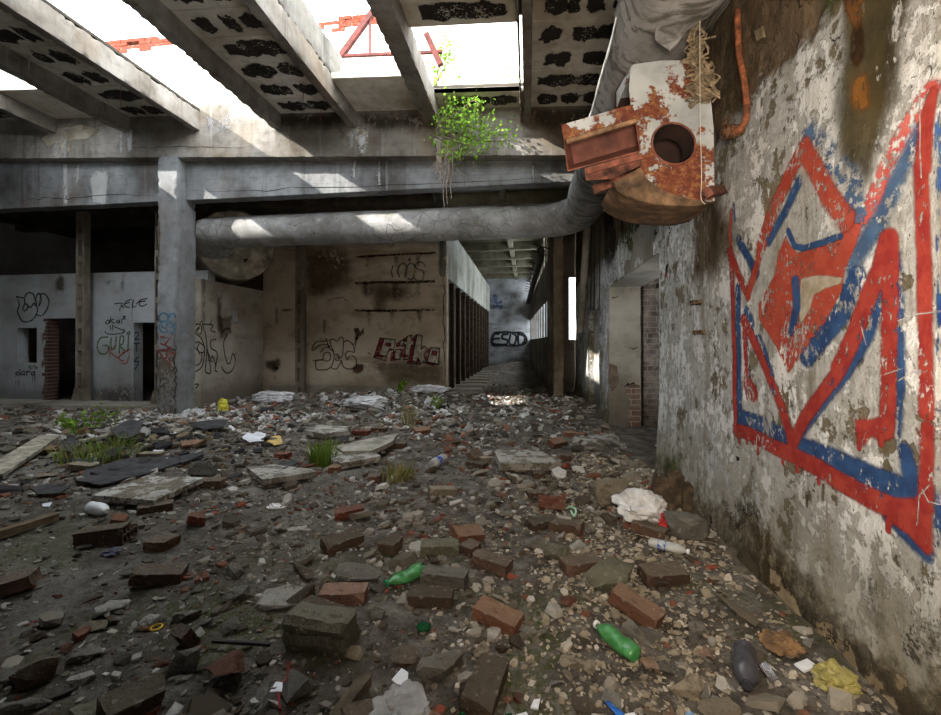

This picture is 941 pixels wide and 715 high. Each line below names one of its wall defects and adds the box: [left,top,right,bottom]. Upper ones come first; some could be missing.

peeling [41,124,98,155]
water stain [837,0,904,181]